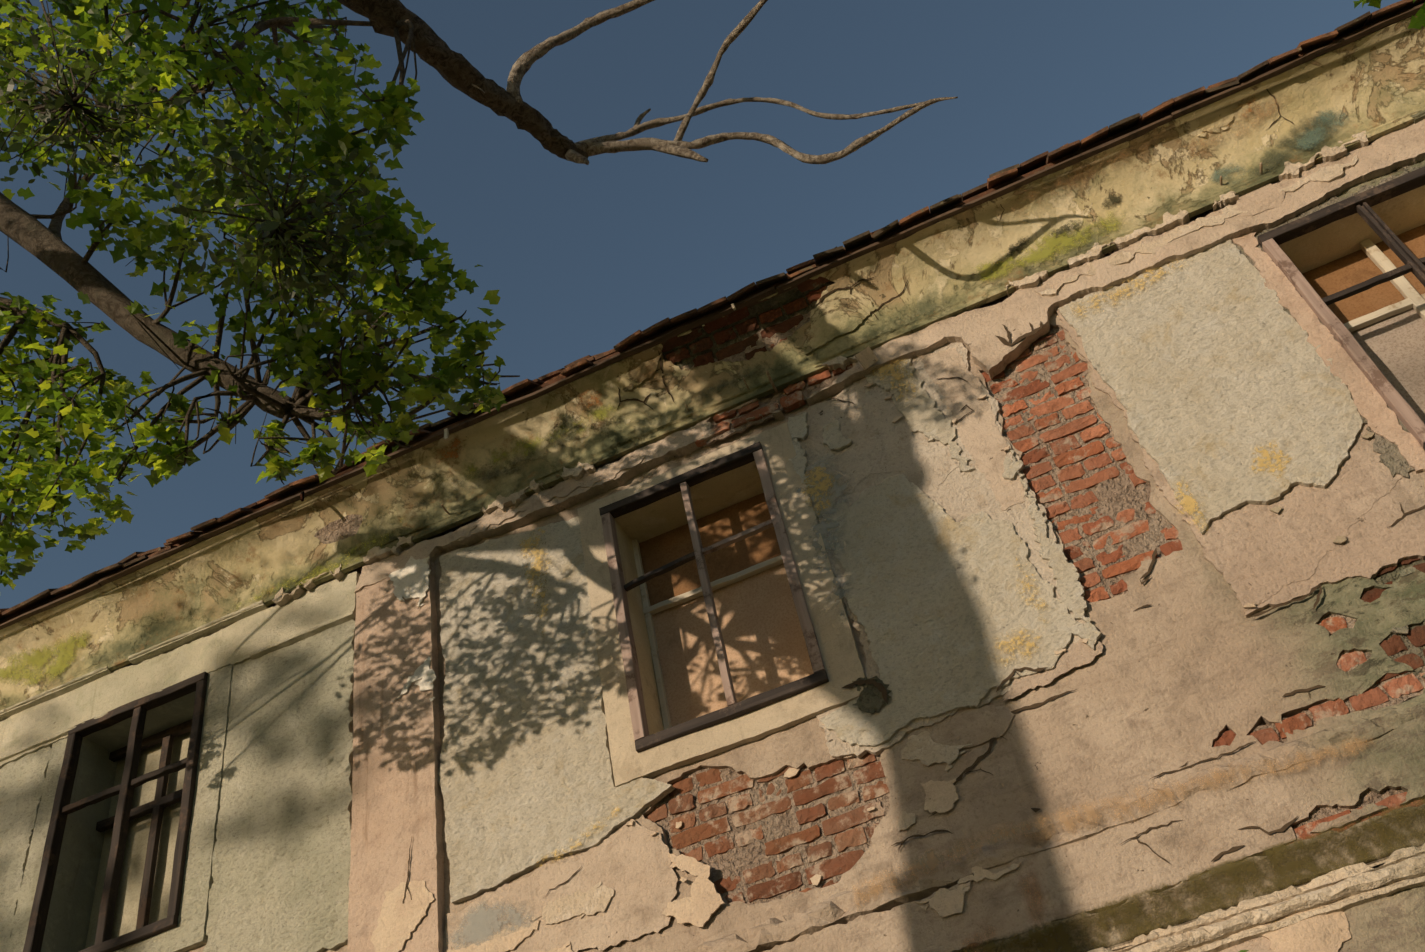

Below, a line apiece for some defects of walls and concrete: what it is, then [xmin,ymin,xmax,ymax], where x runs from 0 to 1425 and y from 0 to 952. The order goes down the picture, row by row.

leakage [1258,111,1345,173]
leakage [1009,238,1029,256]
leakage [1051,220,1080,238]
leakage [1102,194,1120,207]
crack [815,276,909,319]
spalling [621,276,876,391]
spalling [811,327,1183,603]
peeling [389,555,431,609]
peeling [392,657,436,702]
spalling [1212,620,1425,747]
spalling [443,731,972,952]
peeling [370,880,435,952]